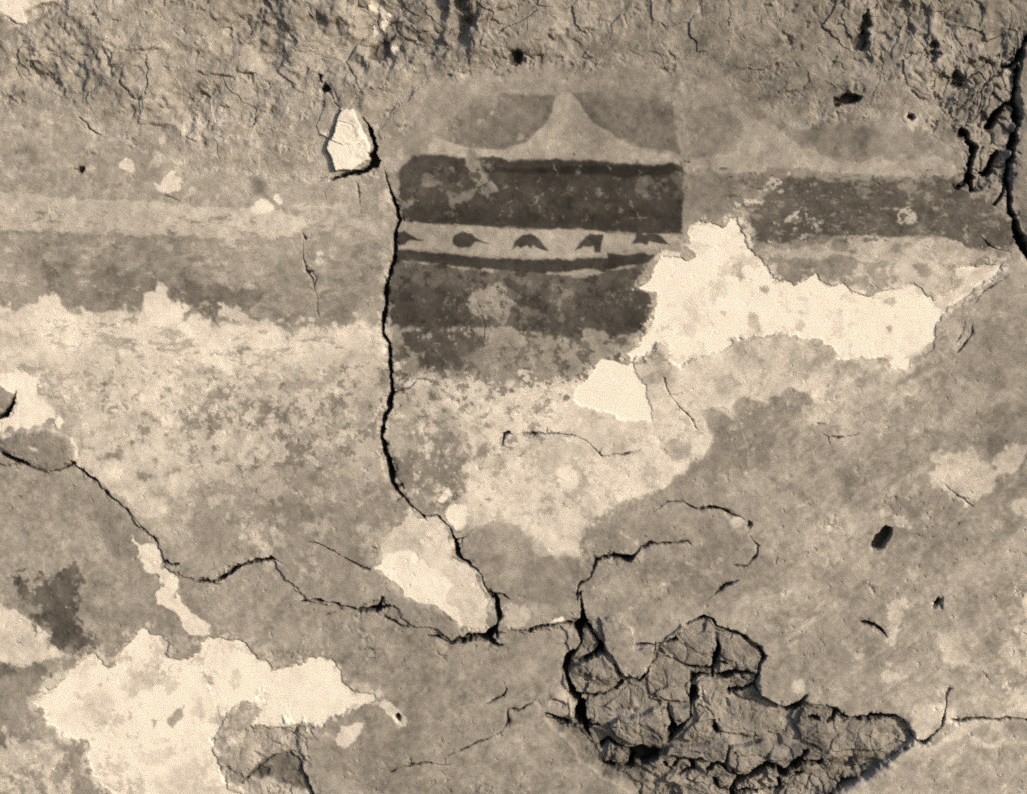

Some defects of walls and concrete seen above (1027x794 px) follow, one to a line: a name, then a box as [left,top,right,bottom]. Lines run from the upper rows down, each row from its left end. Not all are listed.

spalling [0,0,1027,194]
crack [0,390,17,420]
crack [3,451,286,584]
flaking render [0,160,1004,632]
crack [298,117,1027,794]
flaking render [34,627,408,794]
spalling [548,616,913,794]